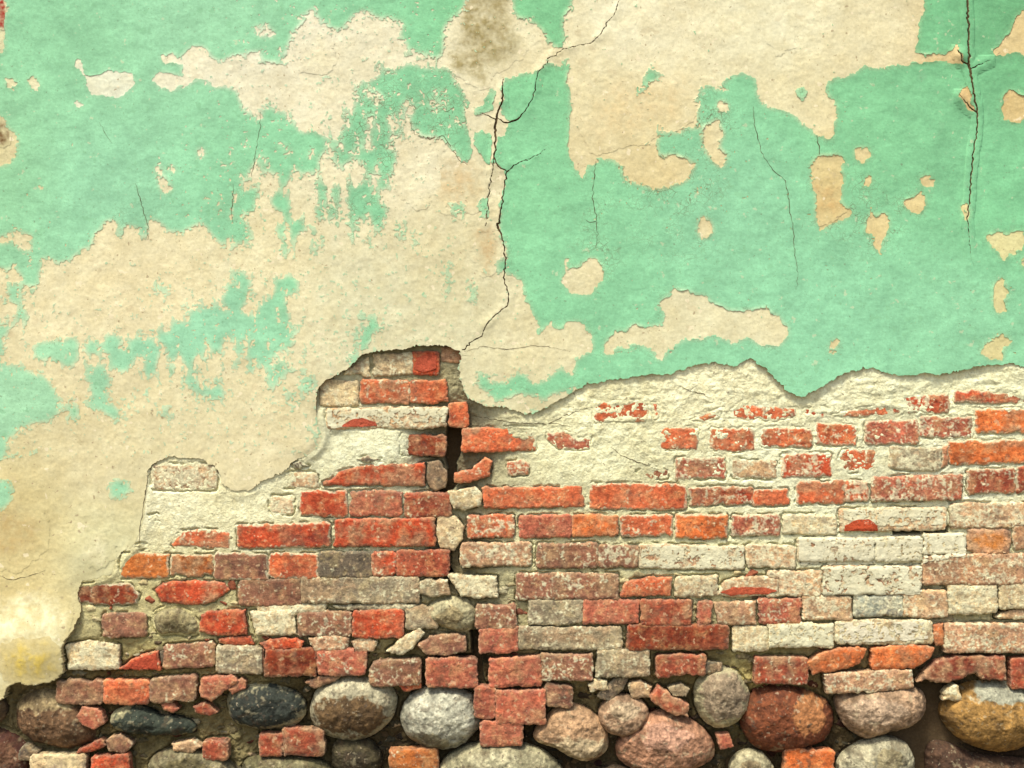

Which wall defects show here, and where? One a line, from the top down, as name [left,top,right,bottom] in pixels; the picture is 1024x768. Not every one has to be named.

crack [957,0,989,252]
crack [415,0,620,351]
crack [753,107,798,287]
peeling [0,0,1024,562]
crack [401,429,458,491]
spalling [38,582,82,685]
spalling [123,652,158,670]
crack [436,538,465,574]
peeling [641,545,745,569]
spalling [721,587,777,596]
peeling [769,621,930,647]
peeling [798,508,967,596]